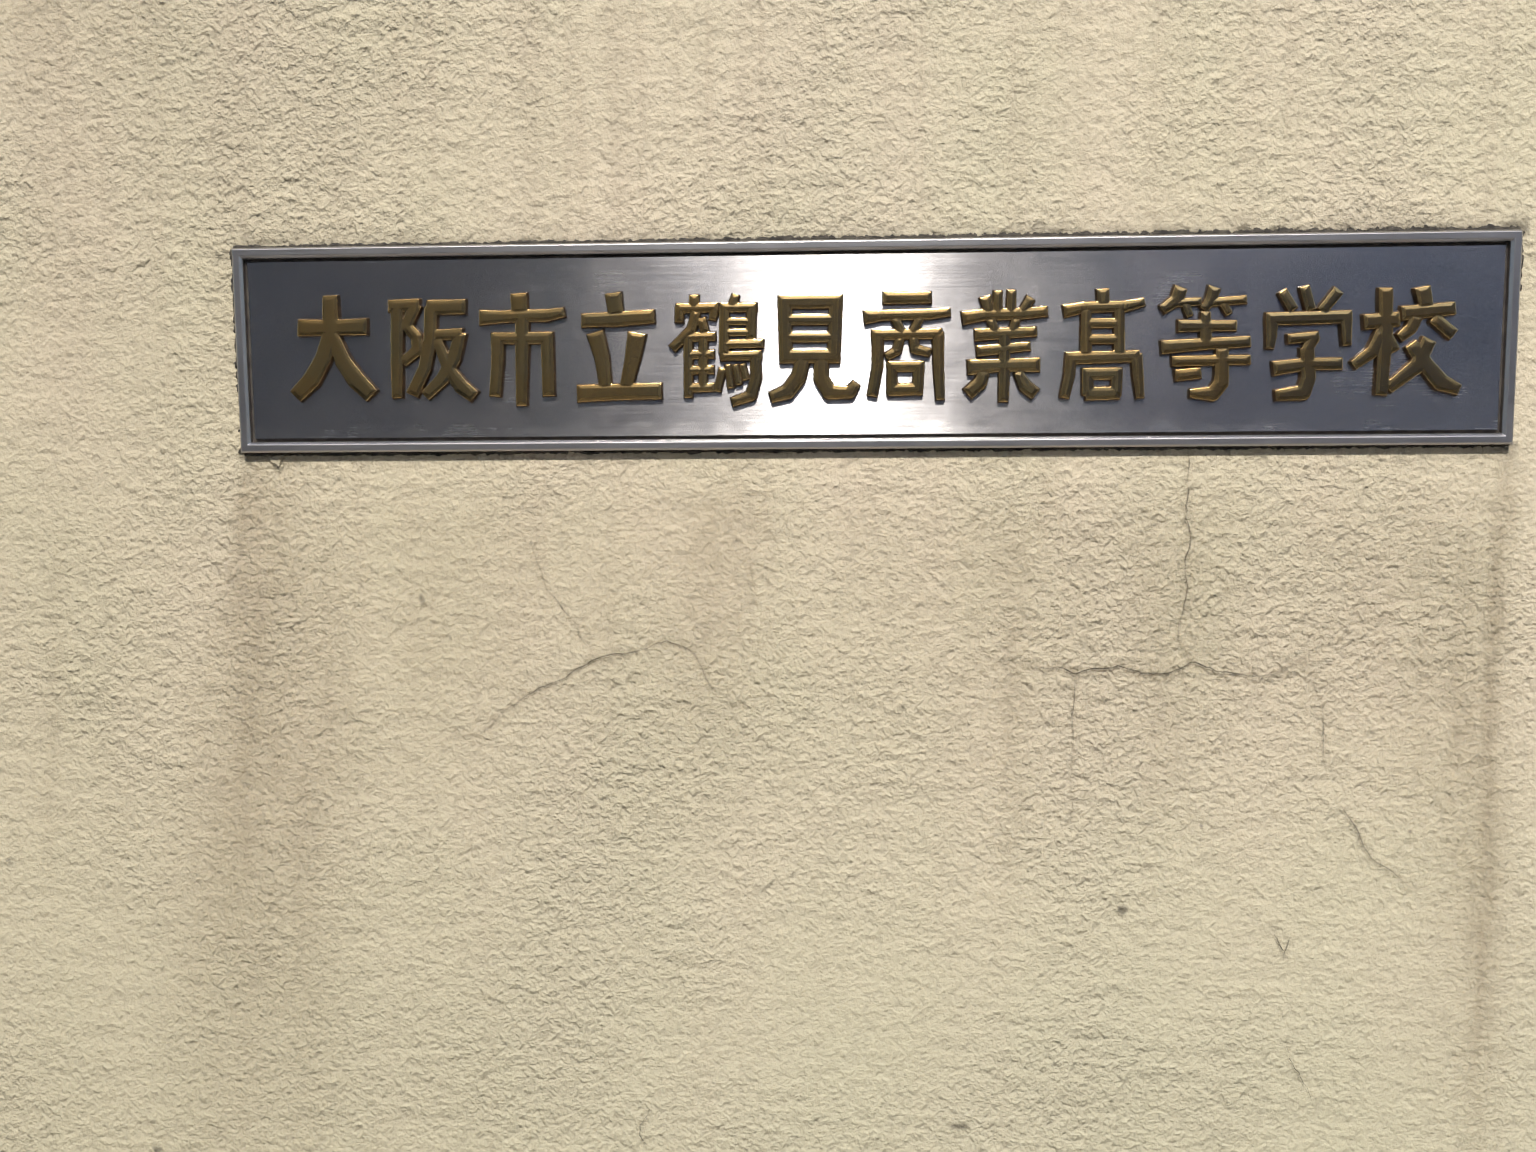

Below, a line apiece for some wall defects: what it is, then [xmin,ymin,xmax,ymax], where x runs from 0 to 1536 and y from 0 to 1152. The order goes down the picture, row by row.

crack [451,543,754,738]
crack [1035,460,1369,808]
crack [1344,810,1414,888]